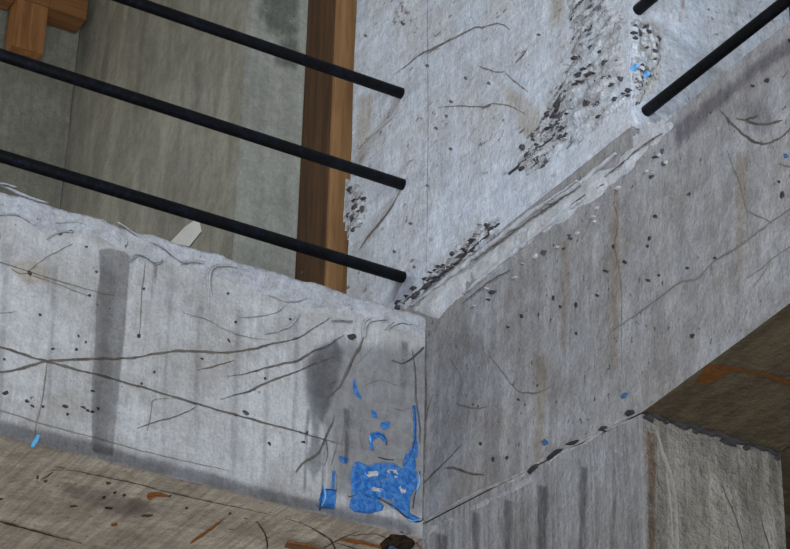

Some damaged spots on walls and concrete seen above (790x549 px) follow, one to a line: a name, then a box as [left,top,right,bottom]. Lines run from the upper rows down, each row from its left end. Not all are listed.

crack [393,12,510,75]
crack [438,103,525,114]
spalling [508,0,662,176]
crack [719,109,790,145]
crack [0,244,114,296]
crack [606,151,790,363]
crack [0,305,372,471]
leakage [313,343,425,510]
peeling [318,471,337,510]
peeling [339,405,424,523]
crack [424,445,483,483]
spalling [380,532,423,549]